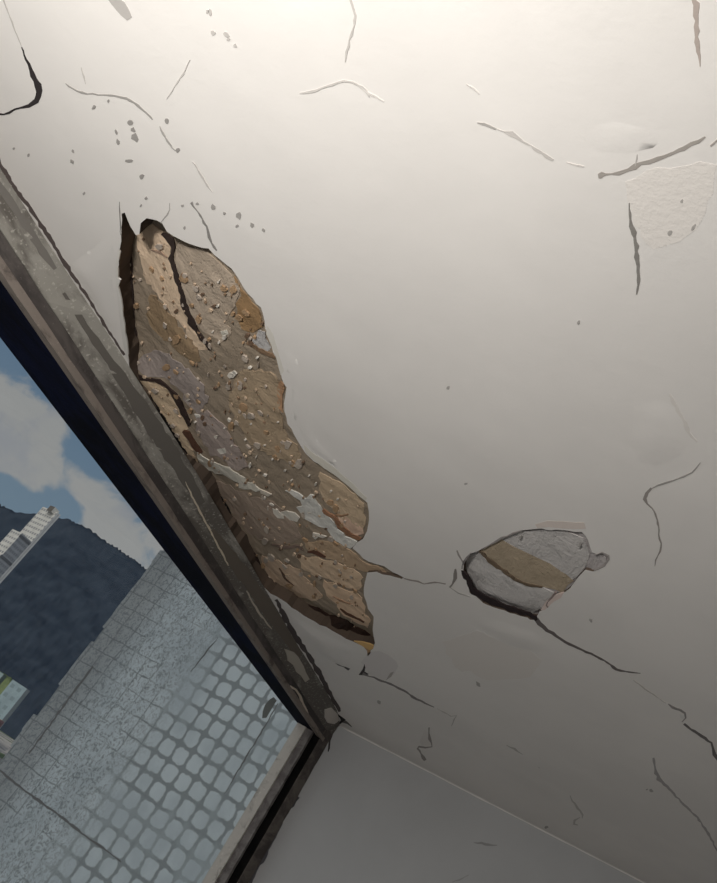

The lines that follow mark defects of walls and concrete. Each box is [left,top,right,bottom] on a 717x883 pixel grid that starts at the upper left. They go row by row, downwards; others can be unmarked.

crack [0,0,42,115]
crack [692,0,701,66]
crack [477,122,717,179]
crack [65,67,217,350]
crack [629,203,640,295]
spalling [75,220,396,655]
crack [643,463,700,565]
spalling [466,521,608,614]
peeling [284,649,309,682]
crack [336,663,457,761]
crack [404,530,717,760]
crack [652,758,717,851]